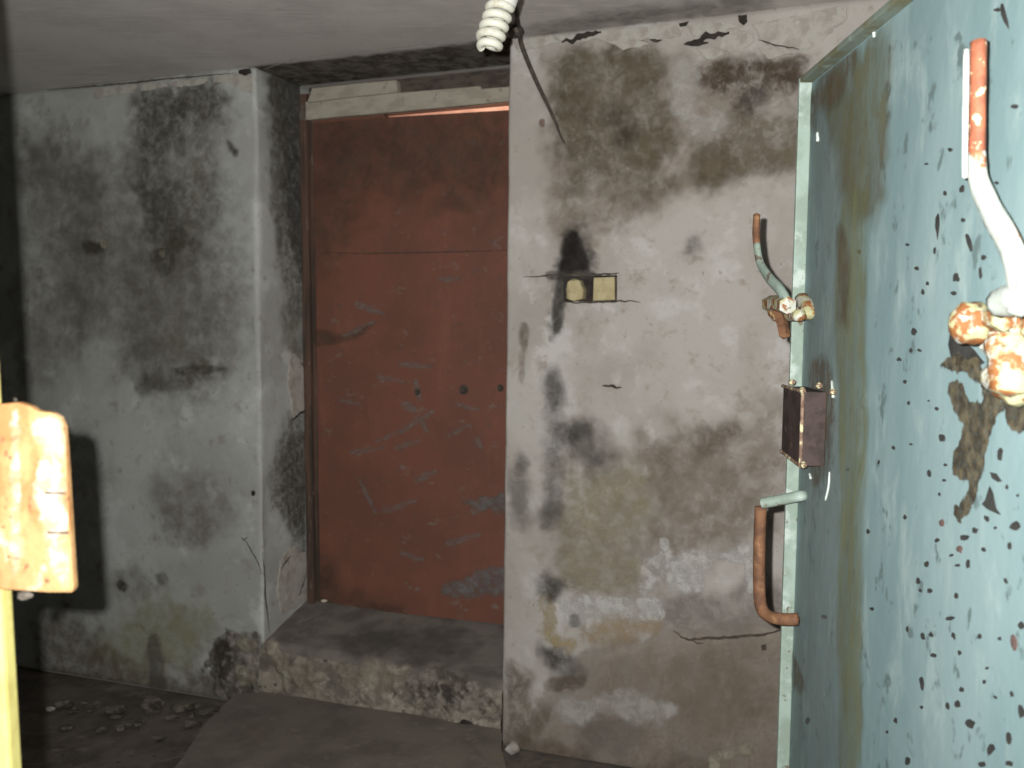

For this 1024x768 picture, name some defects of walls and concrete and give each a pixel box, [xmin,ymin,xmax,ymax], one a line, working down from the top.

peeling [513,5,848,60]
water stain [671,56,800,137]
water stain [547,232,589,331]
water stain [564,538,753,635]
spalling [201,629,263,700]
crack [673,629,781,644]
water stain [551,679,677,726]